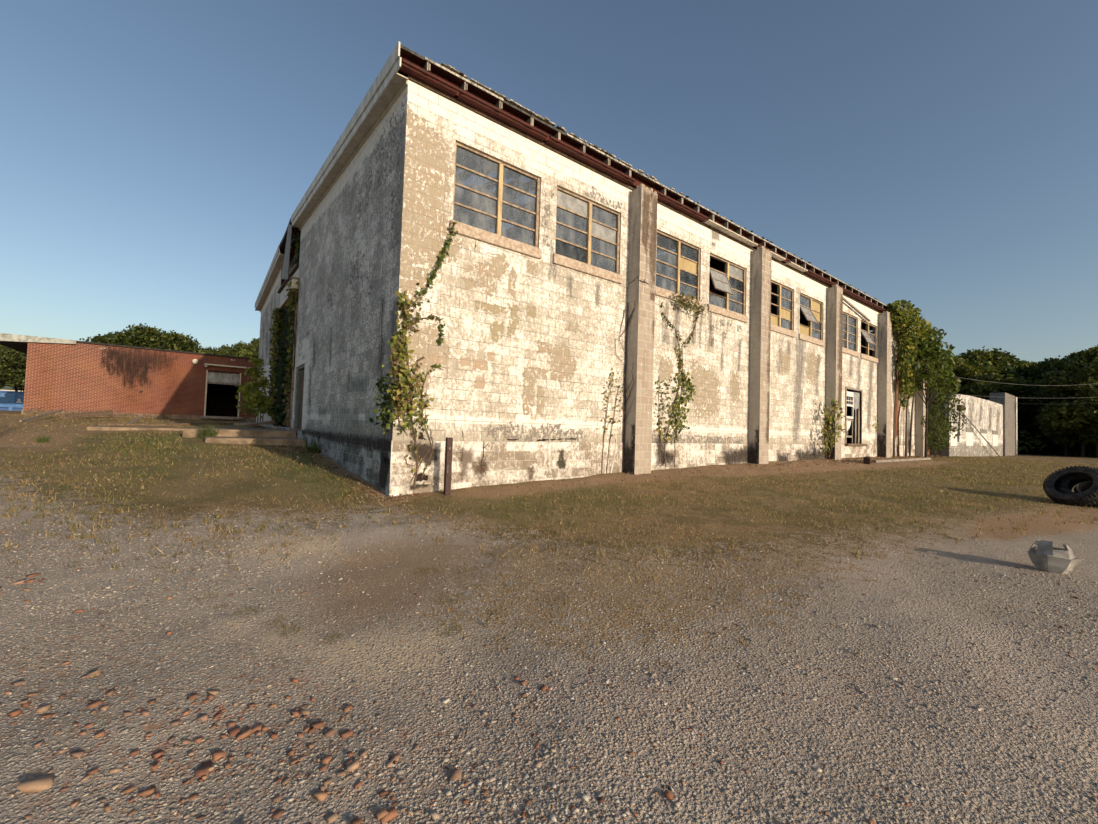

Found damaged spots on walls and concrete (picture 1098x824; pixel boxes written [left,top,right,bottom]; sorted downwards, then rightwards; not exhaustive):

peeling [357,92,538,389]
leakage [103,346,170,384]
peeling [480,321,586,442]